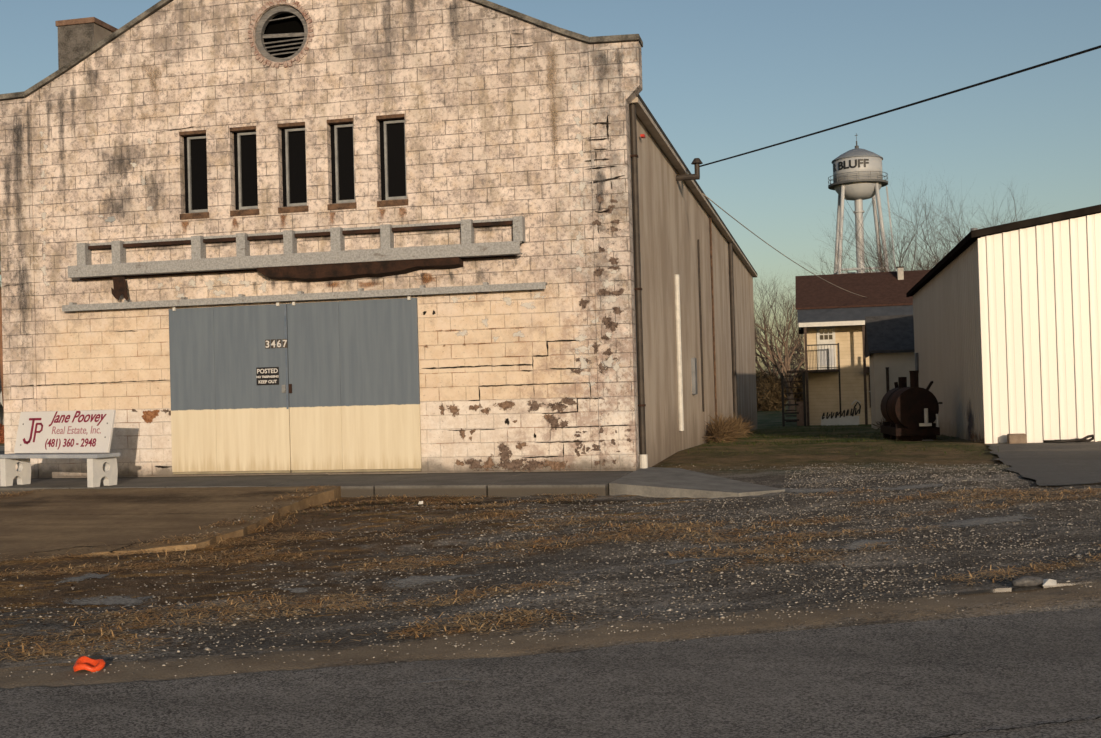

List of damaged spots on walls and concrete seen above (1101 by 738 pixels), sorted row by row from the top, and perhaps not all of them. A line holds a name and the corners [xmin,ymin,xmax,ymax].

damp [6,116,50,286]
peeling [592,194,621,232]
peeling [570,246,624,387]
spalling [132,409,171,423]
peeling [439,400,517,425]
peeling [455,397,632,472]